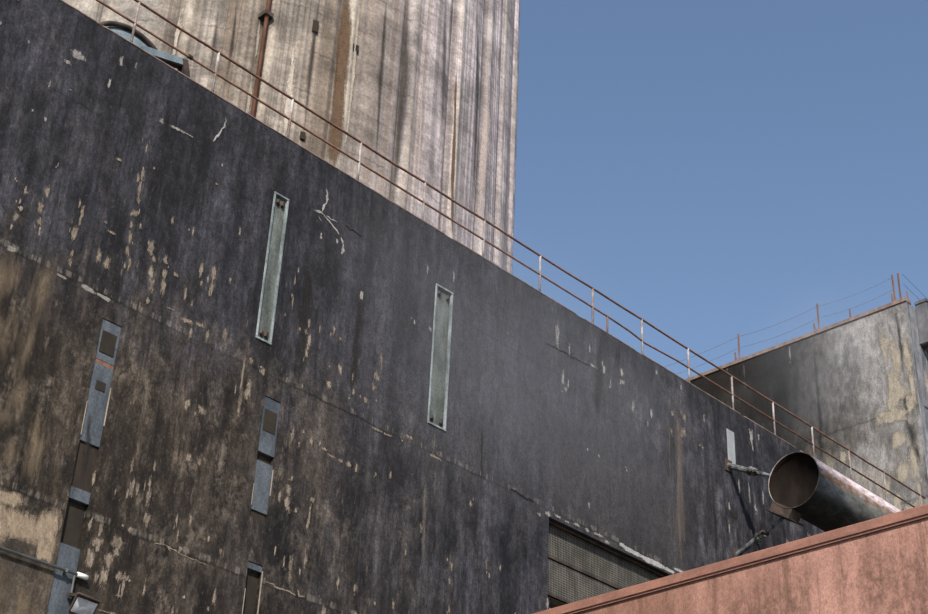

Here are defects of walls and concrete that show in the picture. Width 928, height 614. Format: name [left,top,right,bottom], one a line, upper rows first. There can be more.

peeling [68,201,84,266]
crack [315,189,362,253]
spalling [81,284,111,302]
peeling [297,319,342,362]
peeling [235,355,265,417]
peeling [28,417,44,471]
peeling [291,428,357,472]
peeling [115,458,156,526]
peeling [278,477,298,512]
peeling [85,517,133,597]
peeling [274,546,307,582]
spalling [537,511,684,574]